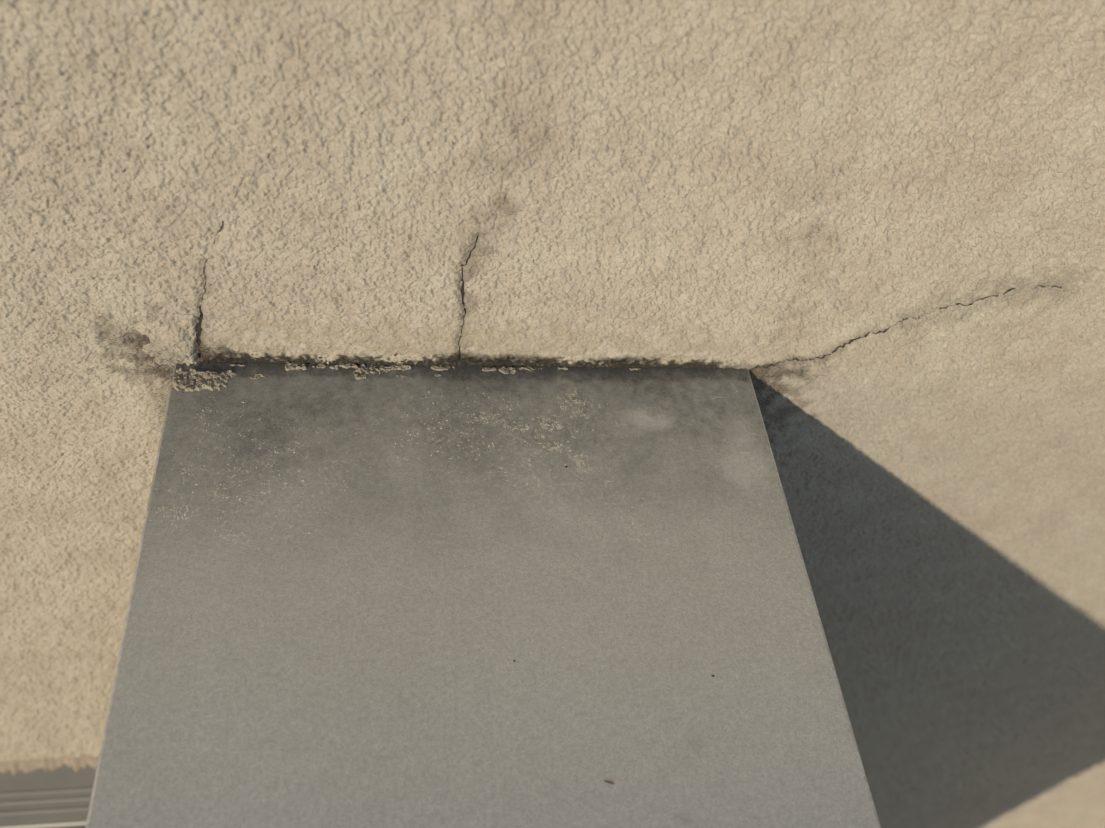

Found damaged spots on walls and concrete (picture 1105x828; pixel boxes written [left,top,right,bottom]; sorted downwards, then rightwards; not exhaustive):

crack [195,221,224,358]
crack [458,235,479,361]
crack [749,285,1062,371]